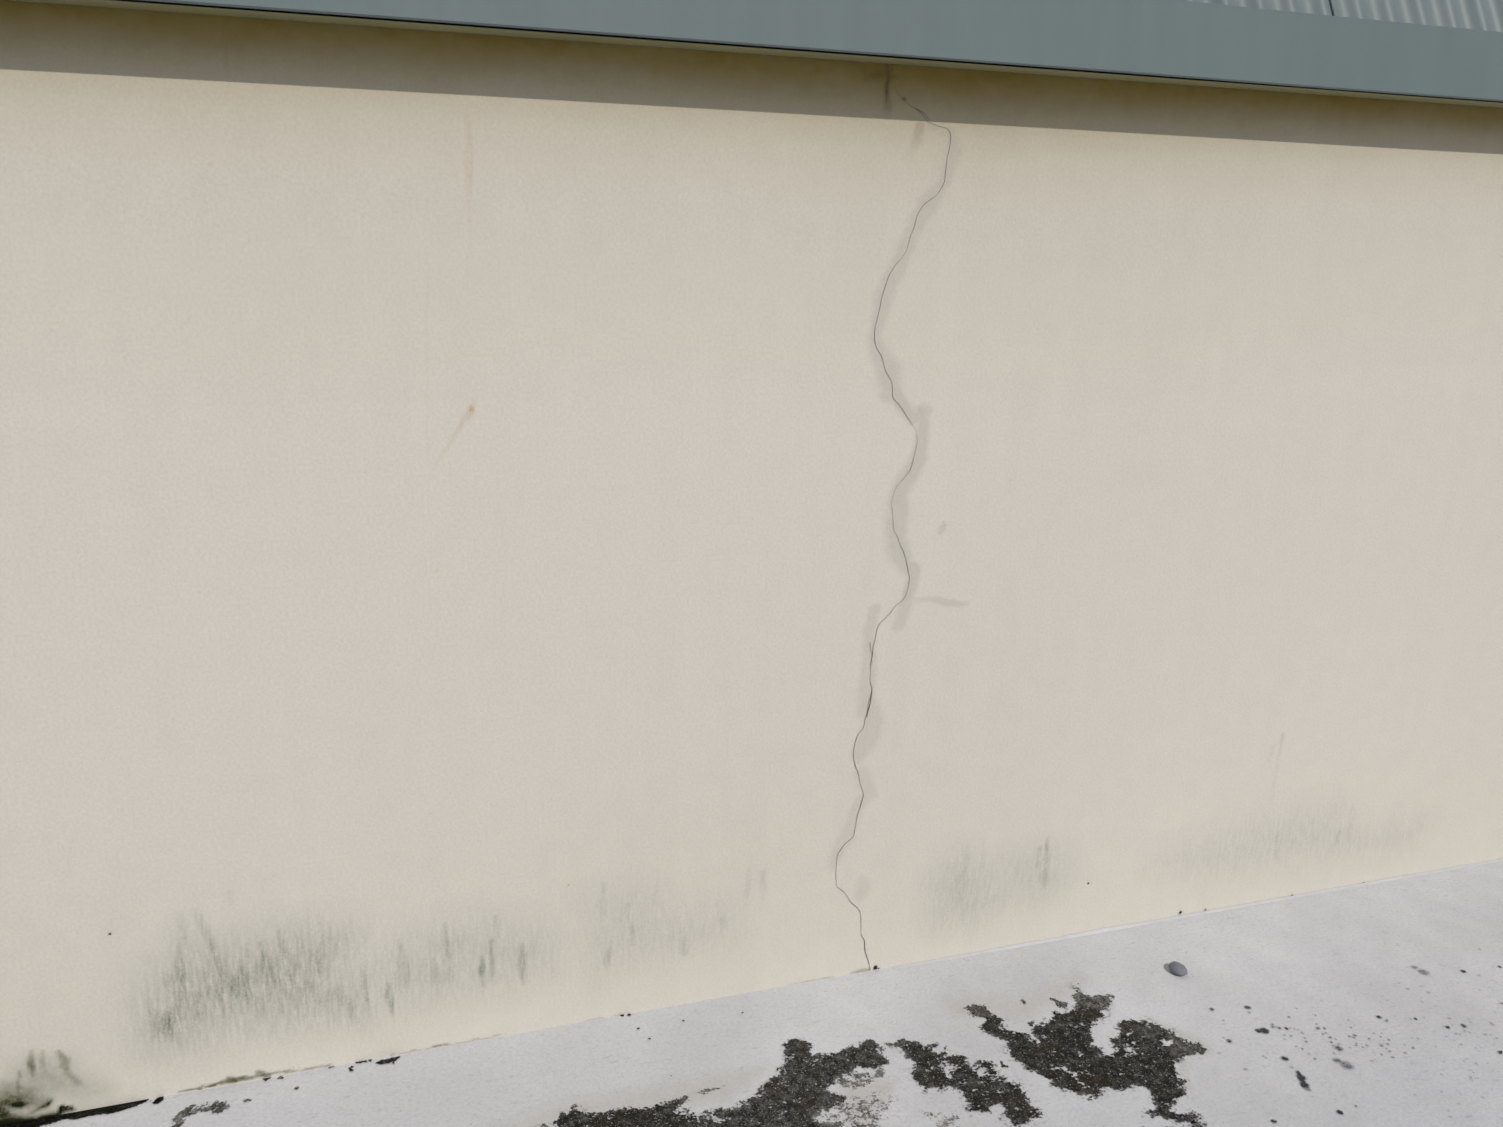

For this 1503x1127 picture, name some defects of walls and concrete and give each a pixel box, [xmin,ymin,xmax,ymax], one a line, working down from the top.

water stain [98,860,758,1083]
peeling [172,1098,251,1127]
peeling [329,1056,400,1071]
peeling [541,985,1207,1127]